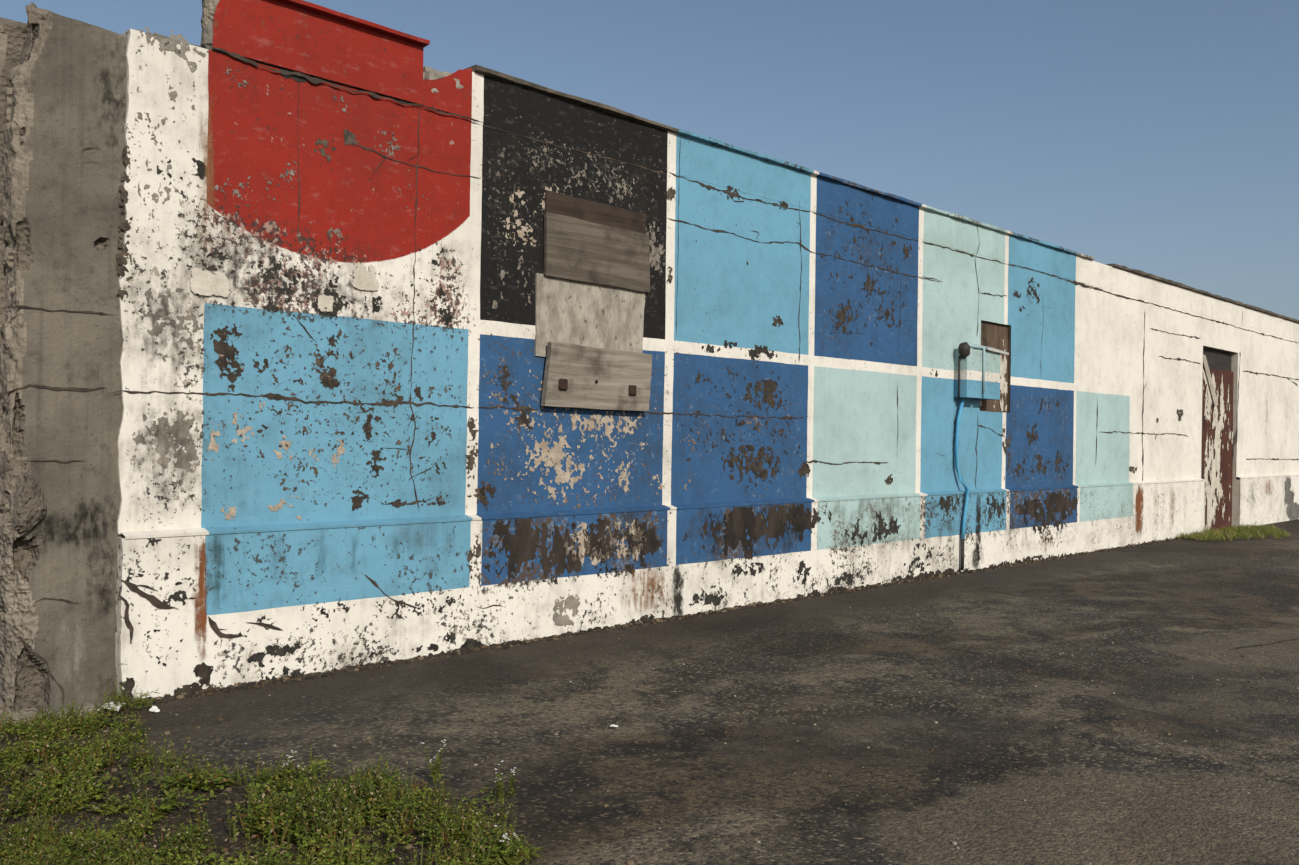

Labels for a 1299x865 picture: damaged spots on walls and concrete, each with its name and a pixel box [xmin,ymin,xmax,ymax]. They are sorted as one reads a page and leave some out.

peeling [116,86,453,520]
peeling [489,144,676,309]
crack [2,47,1299,508]
peeling [980,340,1007,411]
spalling [13,536,40,582]
rust [195,542,207,653]
peeling [466,359,663,627]
peeling [676,364,817,560]
spalling [877,568,968,585]
spalling [989,553,1072,568]
peeling [1002,398,1082,534]
spalling [14,643,51,713]